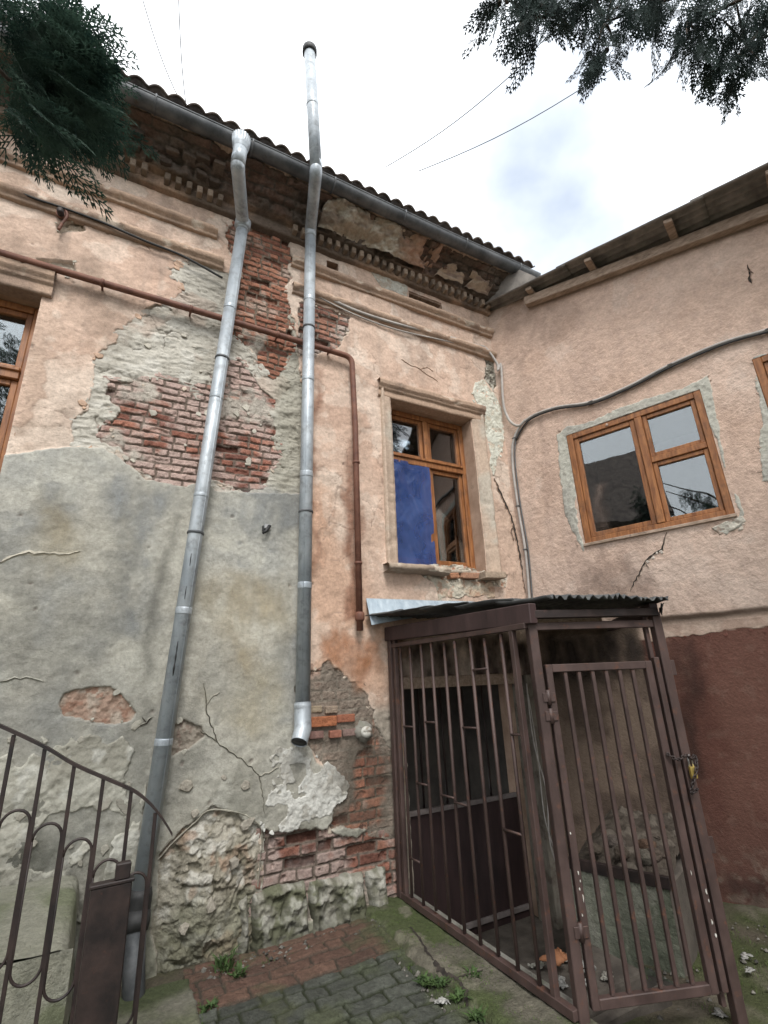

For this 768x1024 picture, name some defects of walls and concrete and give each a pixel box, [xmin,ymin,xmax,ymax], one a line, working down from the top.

peeling [371,272,408,296]
flaking render [69,220,350,494]
peeling [471,358,505,476]
crack [0,550,80,563]
crack [494,478,526,592]
crack [630,532,667,591]
peeling [0,686,147,887]
crack [200,683,278,813]
flaking render [248,660,405,921]